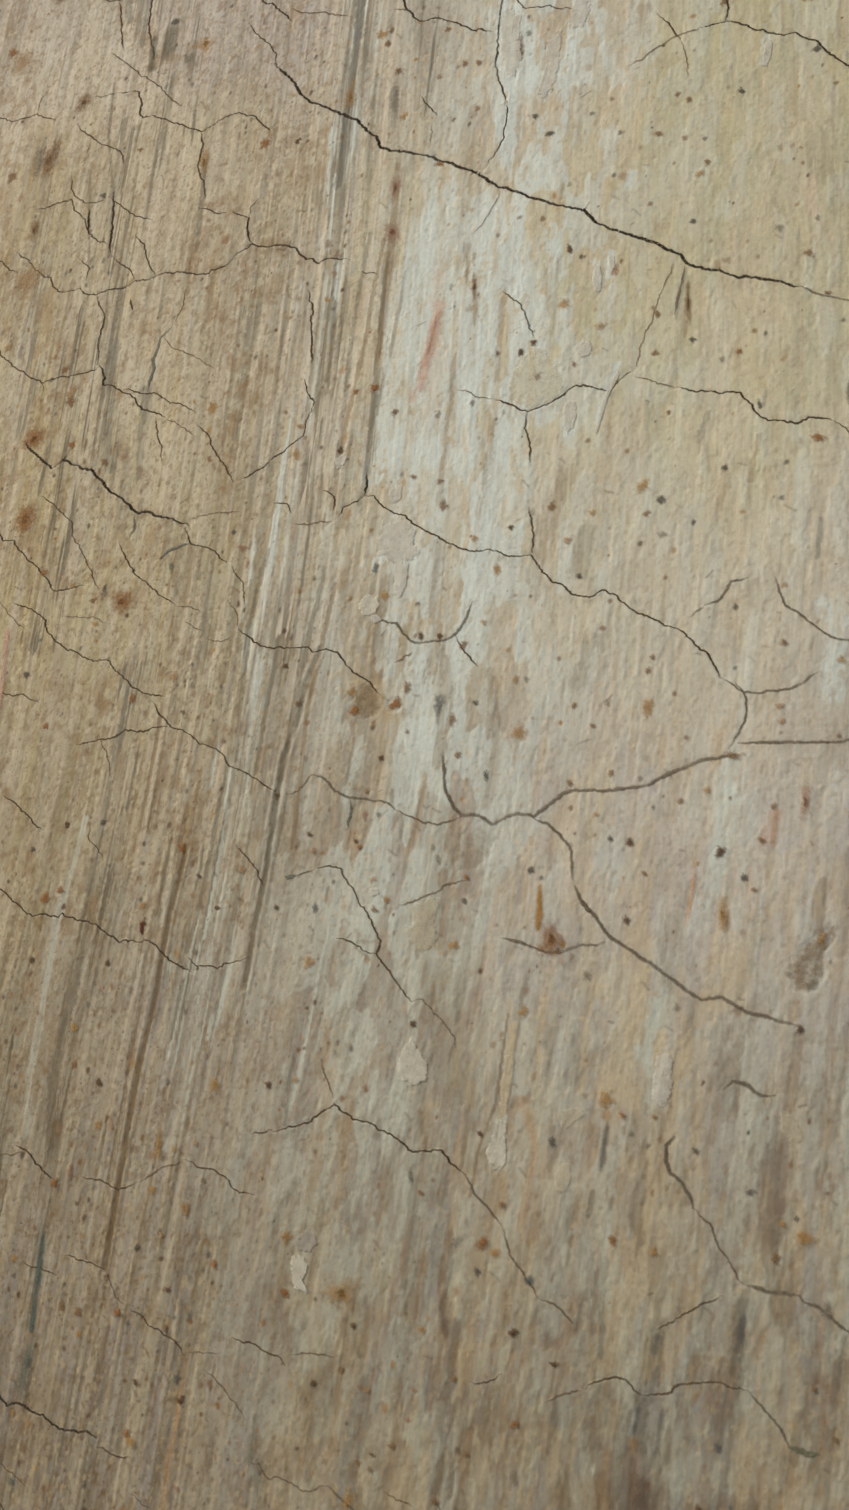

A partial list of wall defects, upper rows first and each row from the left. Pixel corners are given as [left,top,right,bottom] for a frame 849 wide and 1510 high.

crack [0,0,849,1041]
crack [724,1079,774,1097]
crack [0,1145,252,1194]
crack [251,1065,571,1321]
crack [655,1138,849,1332]
crack [21,1254,333,1413]
crack [0,1396,128,1458]
crack [548,1376,818,1457]
crack [252,1463,354,1510]